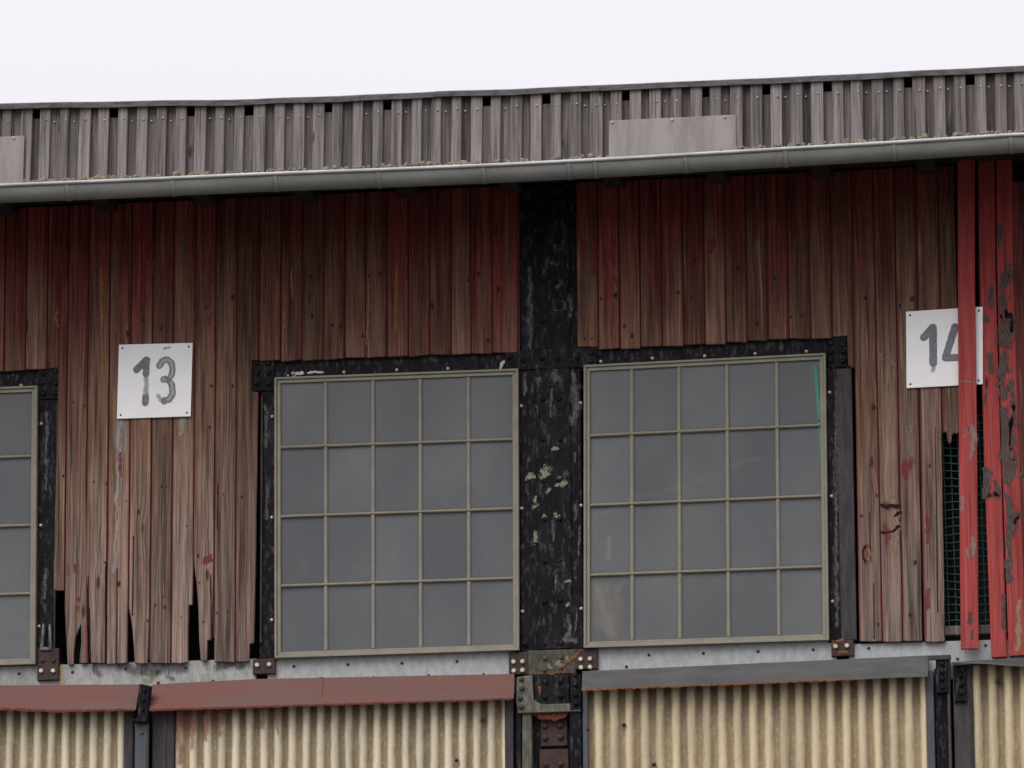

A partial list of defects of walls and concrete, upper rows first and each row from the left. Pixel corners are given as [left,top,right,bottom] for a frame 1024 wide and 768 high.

peeling [963,424,977,461]
peeling [982,263,1023,652]